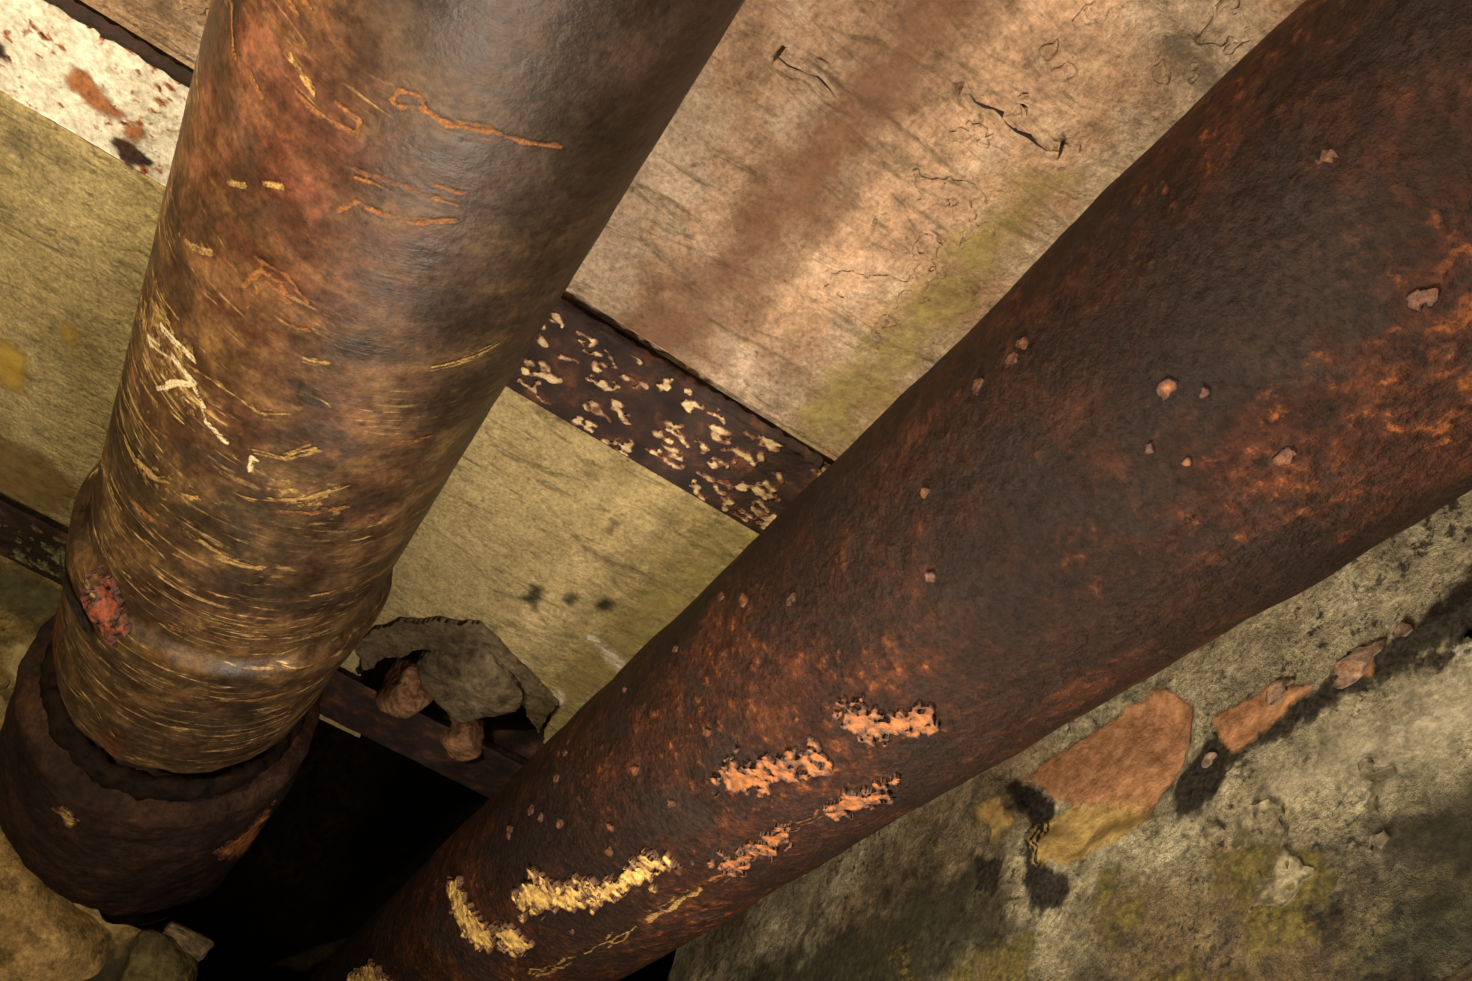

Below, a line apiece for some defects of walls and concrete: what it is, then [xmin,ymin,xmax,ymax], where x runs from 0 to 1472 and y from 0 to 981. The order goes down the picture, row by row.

peeling [0,0,189,187]
corrosion [390,89,561,148]
crack [958,80,1061,161]
corrosion [1405,286,1439,312]
peeling [517,312,785,530]
corrosion [1156,378,1178,400]
corrosion [831,694,939,747]
water stain [1173,569,1472,819]
corrosion [446,735,900,980]
water stain [1379,790,1472,879]
water stain [729,856,1008,981]
corrosion [347,958,393,981]